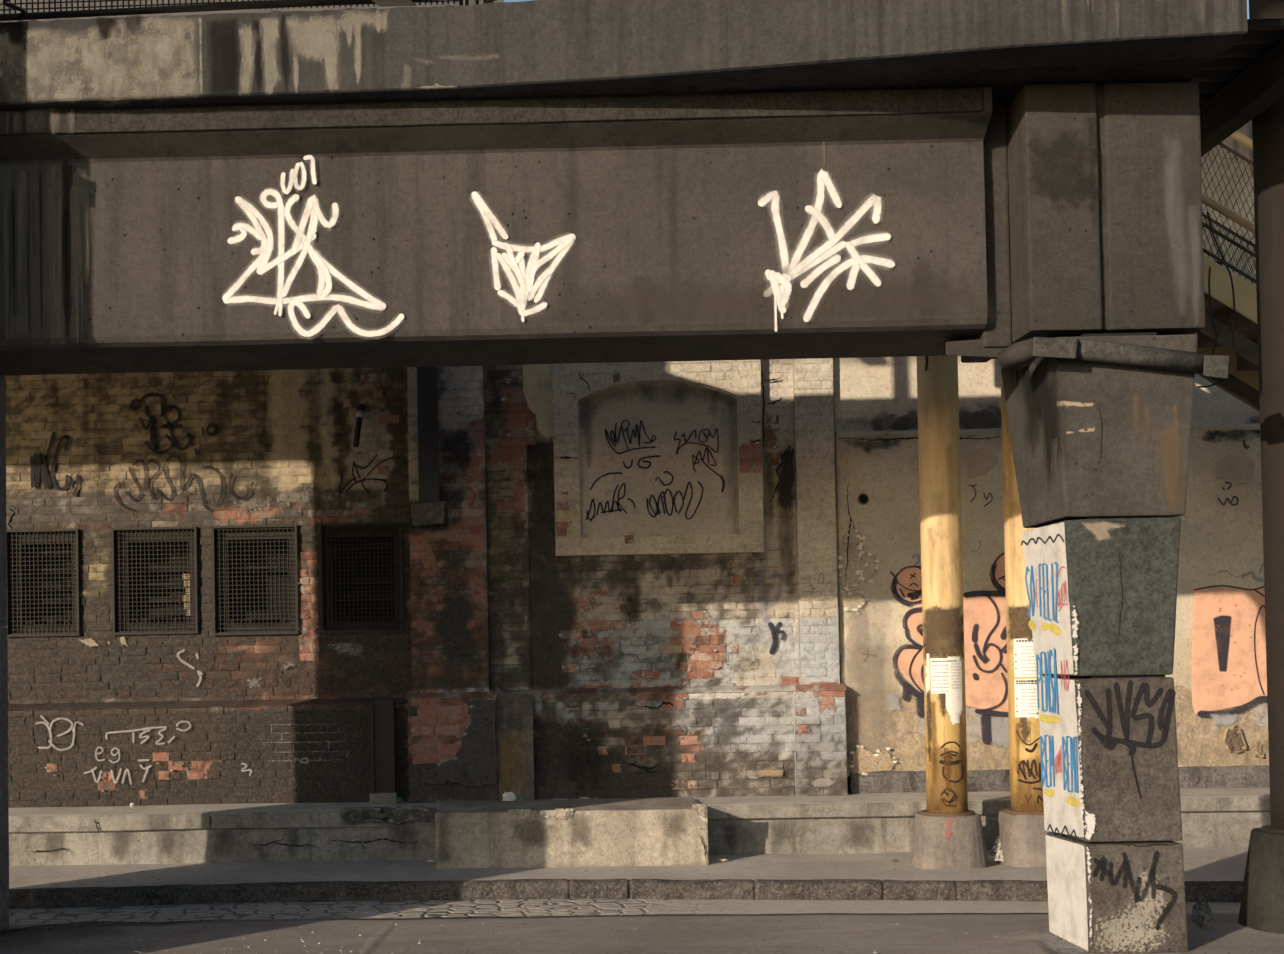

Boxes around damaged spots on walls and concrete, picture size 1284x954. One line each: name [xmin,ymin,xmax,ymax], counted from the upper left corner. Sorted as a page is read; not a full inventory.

water stain [0,22,23,44]
water stain [98,15,139,37]
water stain [210,20,238,93]
water stain [254,21,262,88]
water stain [280,15,289,86]
water stain [63,162,73,335]
flaking render [522,364,554,438]
spalling [298,551,319,661]
peeling [632,611,739,687]
spalling [411,698,471,764]
crack [250,838,417,852]
spalling [341,806,437,825]